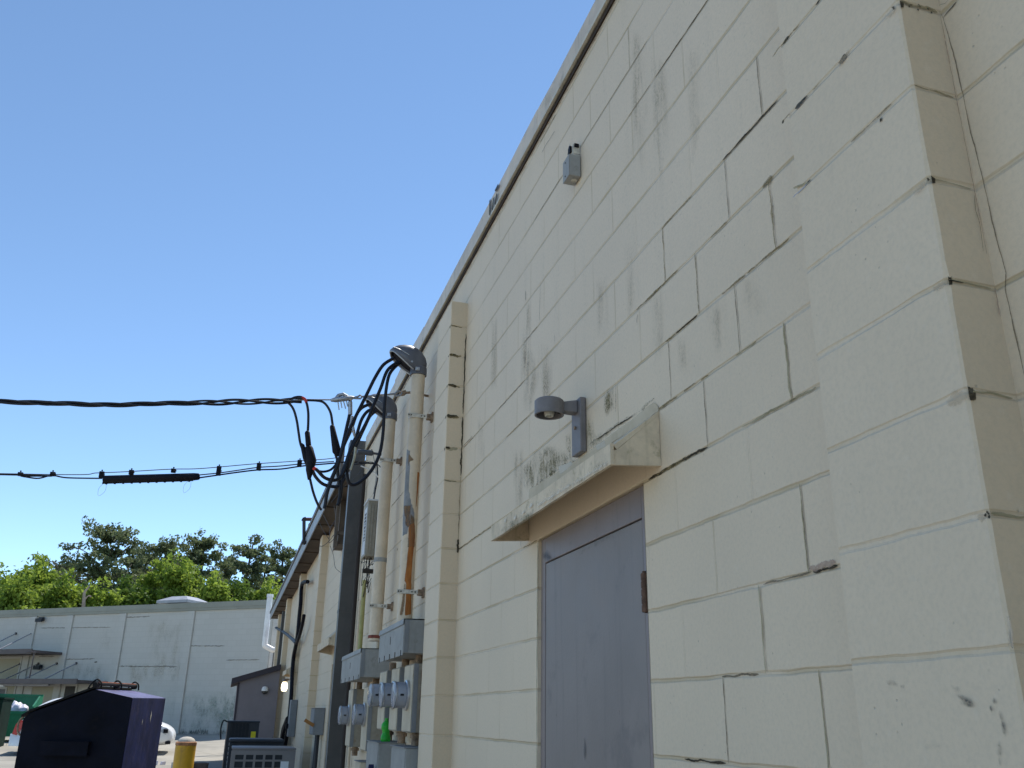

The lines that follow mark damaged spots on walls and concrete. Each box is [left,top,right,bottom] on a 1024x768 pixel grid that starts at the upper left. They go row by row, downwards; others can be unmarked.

crack [710,58,776,238]
crack [939,1,1024,373]
crack [457,337,491,553]
crack [637,176,816,480]
crack [685,486,811,764]
crack [818,670,829,768]